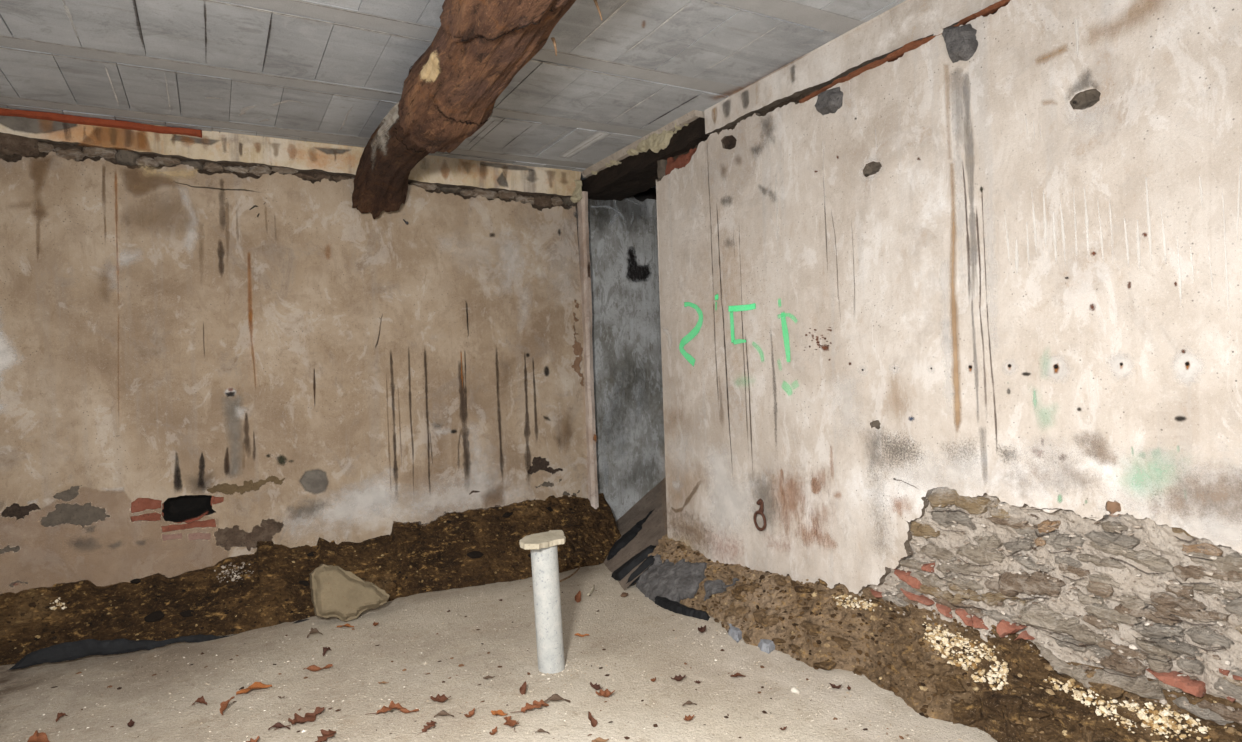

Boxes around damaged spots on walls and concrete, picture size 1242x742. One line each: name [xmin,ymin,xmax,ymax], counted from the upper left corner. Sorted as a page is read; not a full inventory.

spalling [1071,89,1101,110]
leakage [951,123,993,427]
leakage [408,352,430,486]
leakage [459,353,470,475]
leakage [524,356,537,475]
spalling [2,485,110,529]
spalling [130,476,285,551]
spalling [858,487,1242,728]